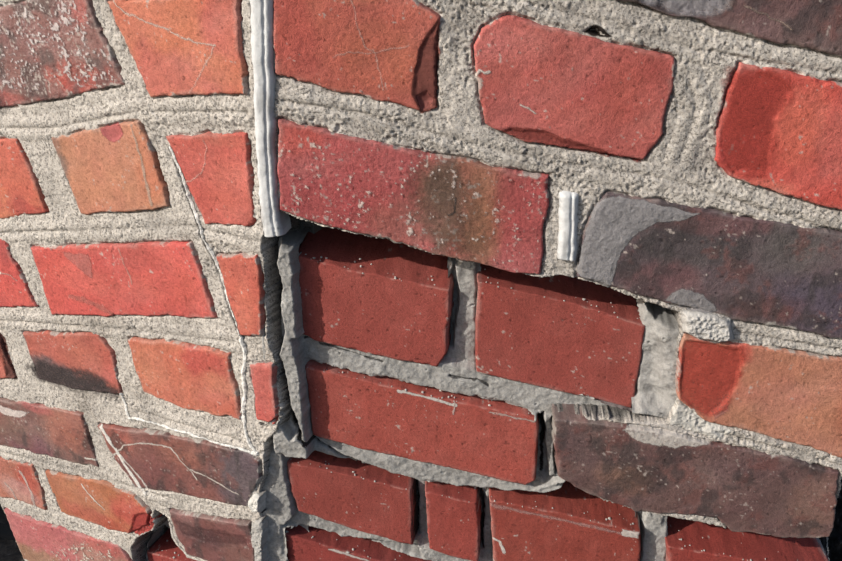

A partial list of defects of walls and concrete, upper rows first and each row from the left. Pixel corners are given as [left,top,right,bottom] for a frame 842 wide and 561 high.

crack [113,146,331,496]